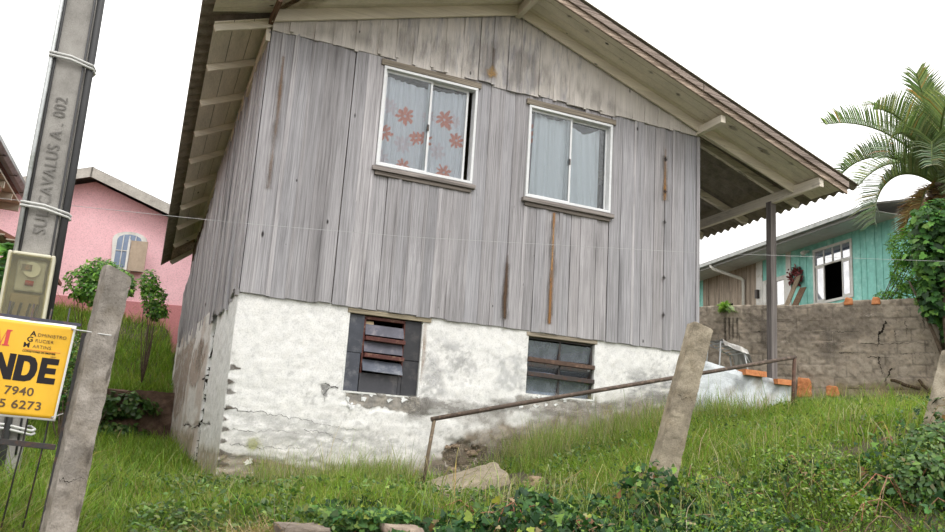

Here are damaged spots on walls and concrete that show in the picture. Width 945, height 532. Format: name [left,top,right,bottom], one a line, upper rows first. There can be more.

crack [754,320,925,382]
crack [183,328,346,463]
spalling [345,392,428,415]